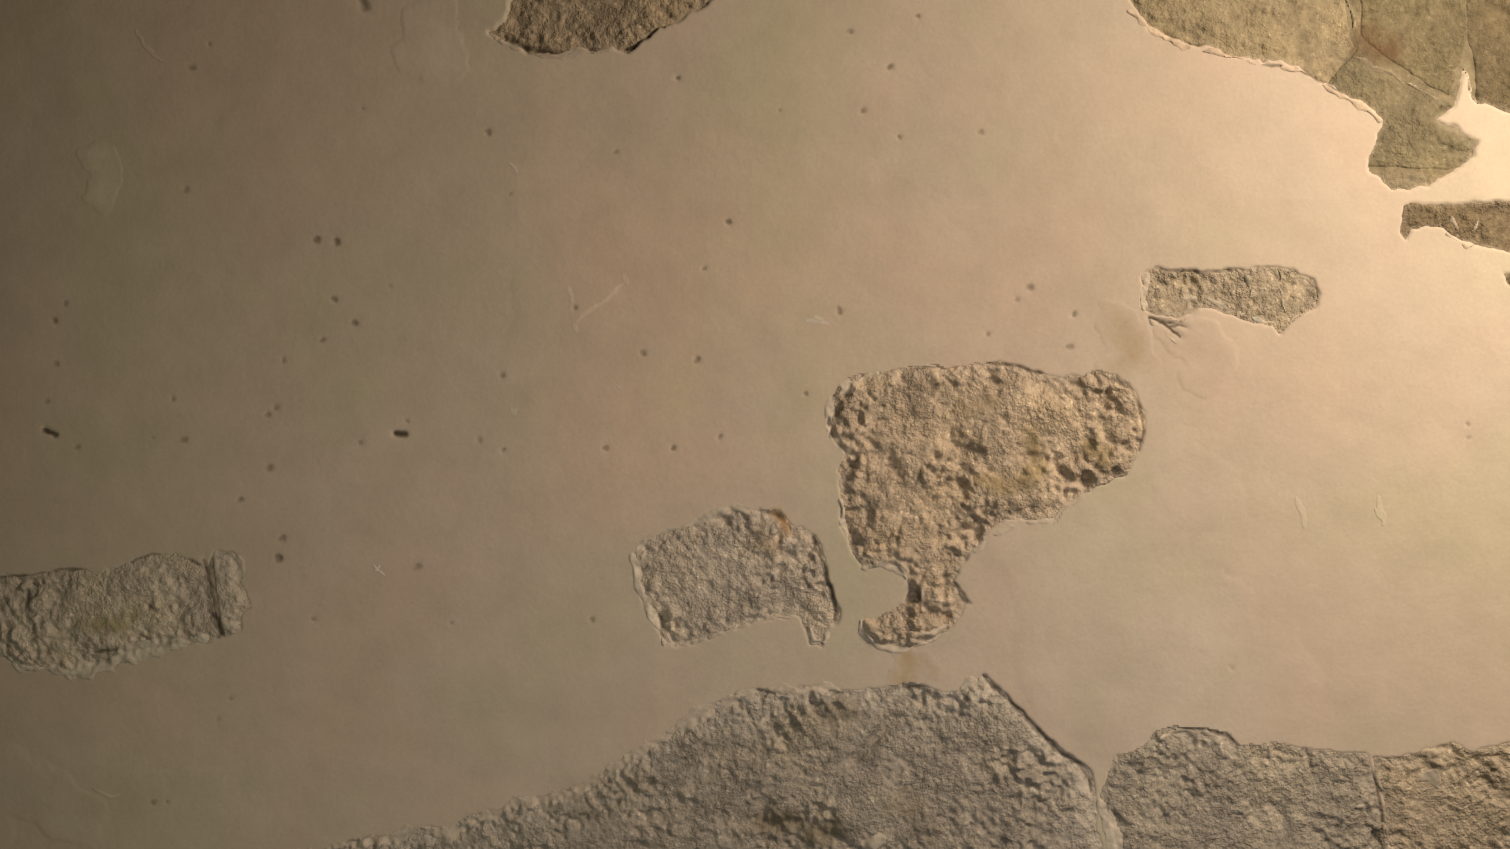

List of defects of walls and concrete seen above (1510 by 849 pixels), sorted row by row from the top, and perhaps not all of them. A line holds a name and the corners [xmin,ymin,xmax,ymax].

peeling [488,0,709,59]
peeling [1127,0,1510,253]
peeling [1140,267,1320,344]
peeling [0,551,252,681]
peeling [629,503,840,647]
peeling [825,361,1146,653]
peeling [296,674,1510,849]